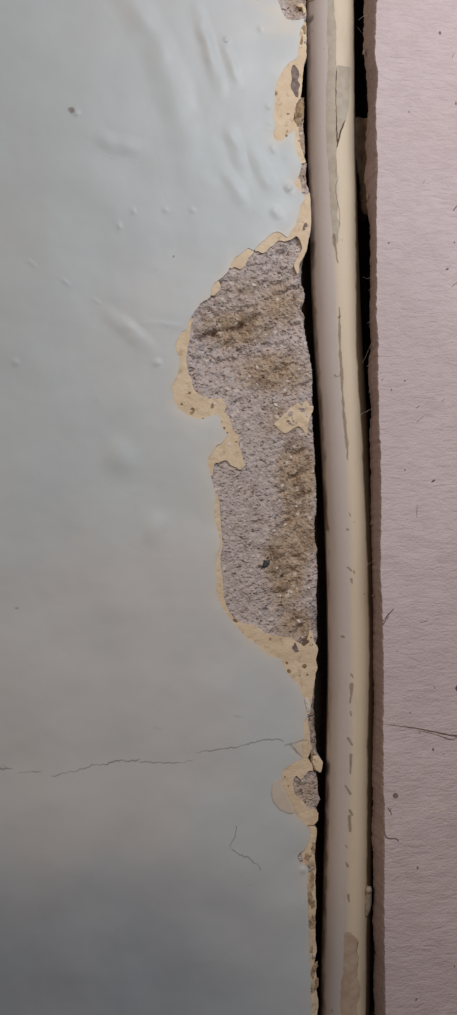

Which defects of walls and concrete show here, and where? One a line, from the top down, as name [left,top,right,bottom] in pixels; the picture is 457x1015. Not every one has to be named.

spalling [172,0,323,1015]
peeling [326,0,351,245]